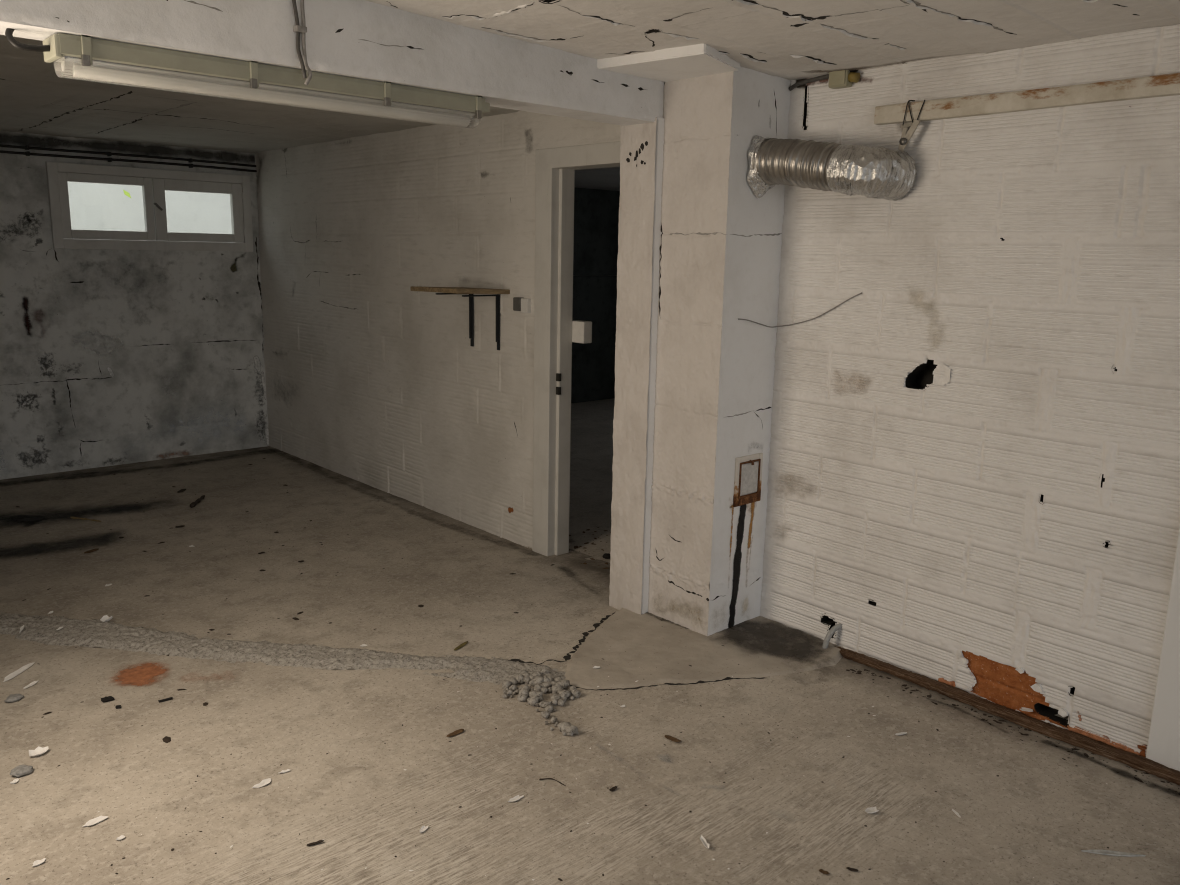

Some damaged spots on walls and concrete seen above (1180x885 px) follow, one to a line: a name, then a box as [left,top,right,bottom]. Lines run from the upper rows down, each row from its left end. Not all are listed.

crack [167,0,223,12]
crack [335,29,424,50]
crack [442,0,1017,65]
crack [561,70,645,91]
crack [659,223,782,315]
spalling [903,358,951,391]
water stain [722,504,823,660]
crack [508,612,765,690]
peeling [938,650,1147,757]